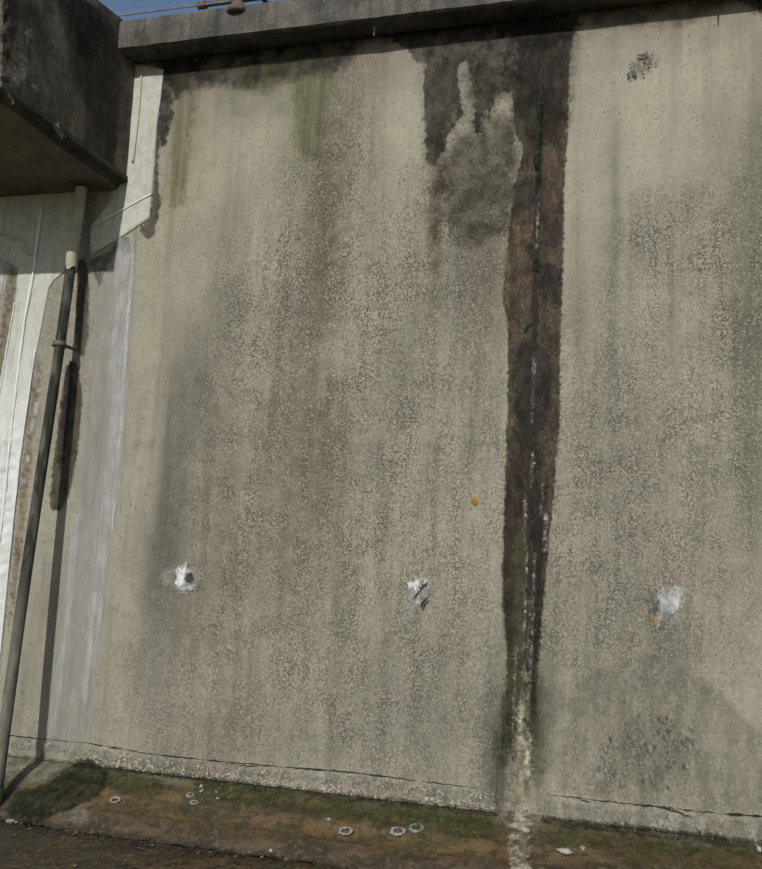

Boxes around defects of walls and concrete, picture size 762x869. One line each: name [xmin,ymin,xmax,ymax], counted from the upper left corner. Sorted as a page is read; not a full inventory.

damp [57,0,122,166]
damp [140,36,371,238]
damp [49,237,133,702]
damp [382,0,762,869]
spalling [175,564,200,593]
spalling [407,578,431,612]
spalling [647,587,683,627]
crack [548,794,762,818]